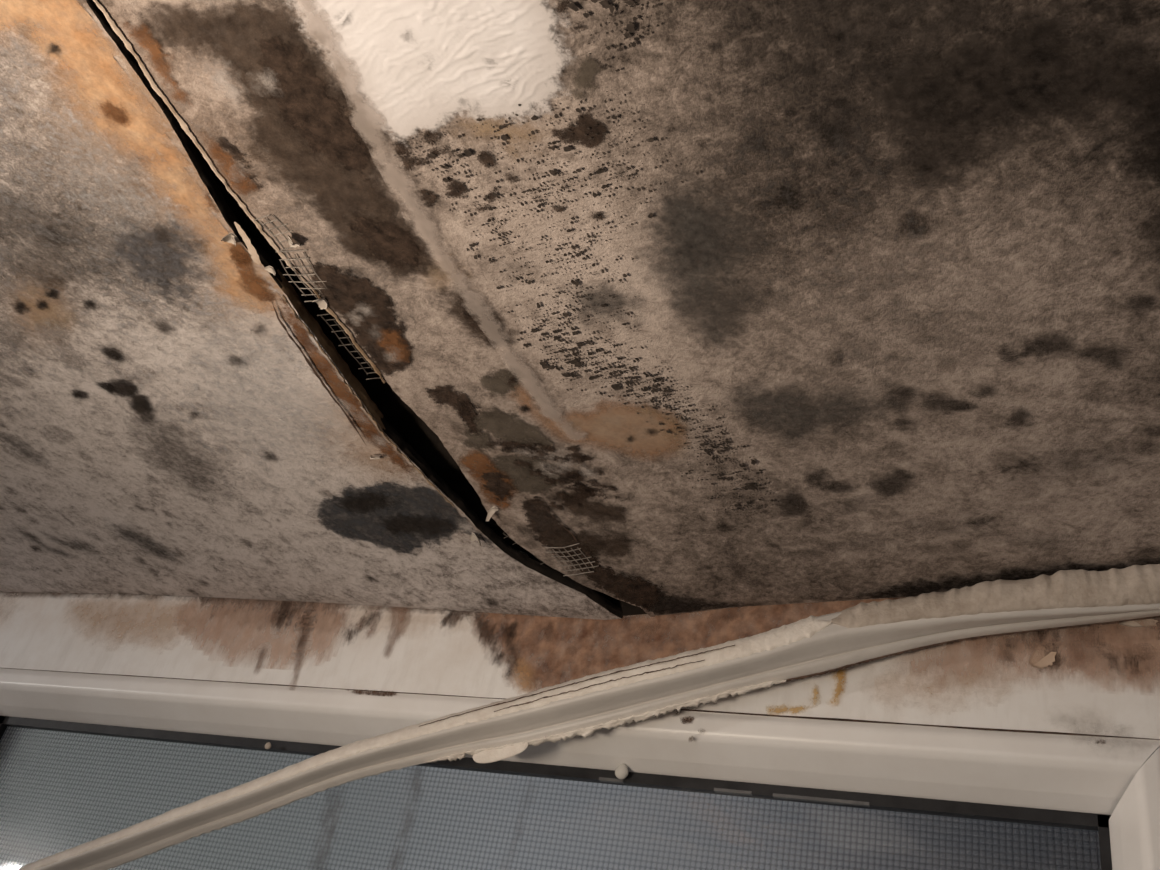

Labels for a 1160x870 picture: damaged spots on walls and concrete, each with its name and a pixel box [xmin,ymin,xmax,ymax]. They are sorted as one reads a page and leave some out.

leakage [0,0,274,310]
leakage [14,277,59,329]
crack [78,0,647,619]
leakage [138,0,805,615]
leakage [102,348,124,362]
leakage [1002,334,1122,368]
leakage [97,380,152,422]
leakage [872,471,912,496]
leakage [847,559,1160,599]
leakage [1,592,469,678]
leakage [911,617,1160,678]
peeling [1029,645,1057,669]